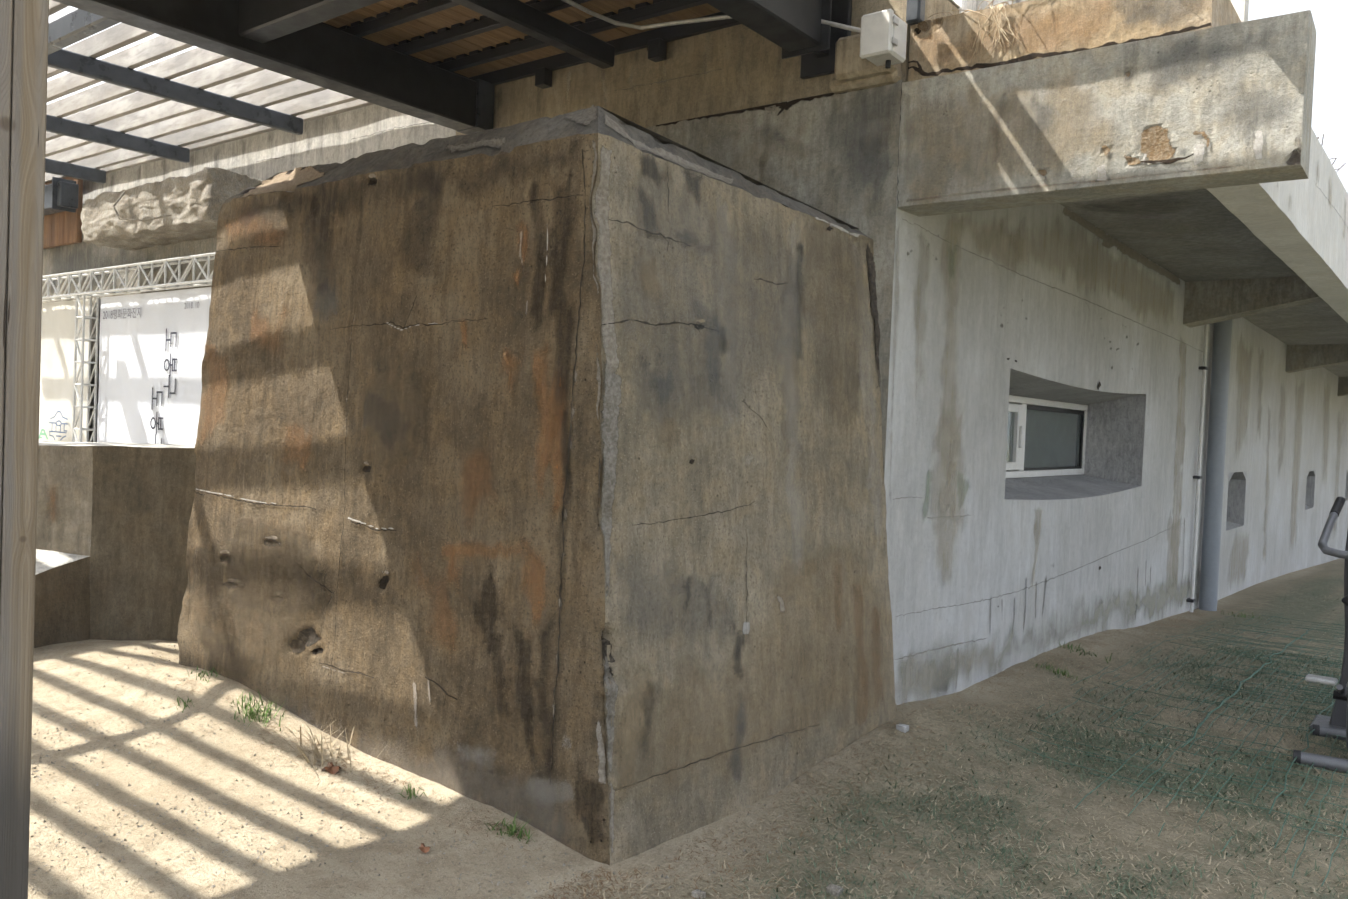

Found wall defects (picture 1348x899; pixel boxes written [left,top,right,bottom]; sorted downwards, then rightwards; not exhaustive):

crack [908,23,1211,76]
crack [656,89,862,126]
spalling [1097,126,1210,181]
crack [492,149,719,784]
crack [637,501,755,635]
leakage [413,680,430,727]
leakage [393,749,561,829]
crack [617,725,818,790]